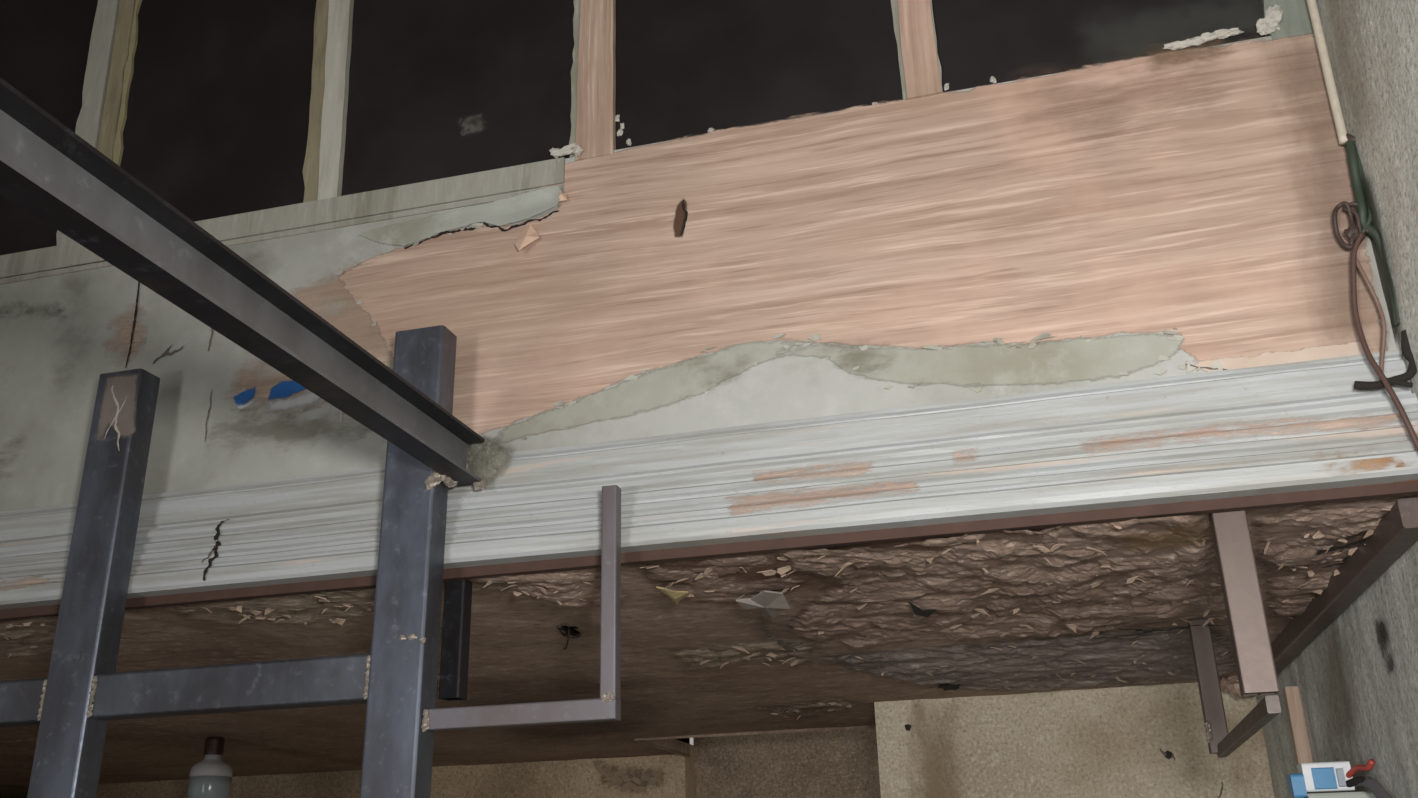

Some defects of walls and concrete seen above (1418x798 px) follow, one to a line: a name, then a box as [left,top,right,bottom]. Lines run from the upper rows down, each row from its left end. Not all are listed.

peeling [295,34,1388,443]
peeling [236,371,304,401]
crack [201,519,230,581]